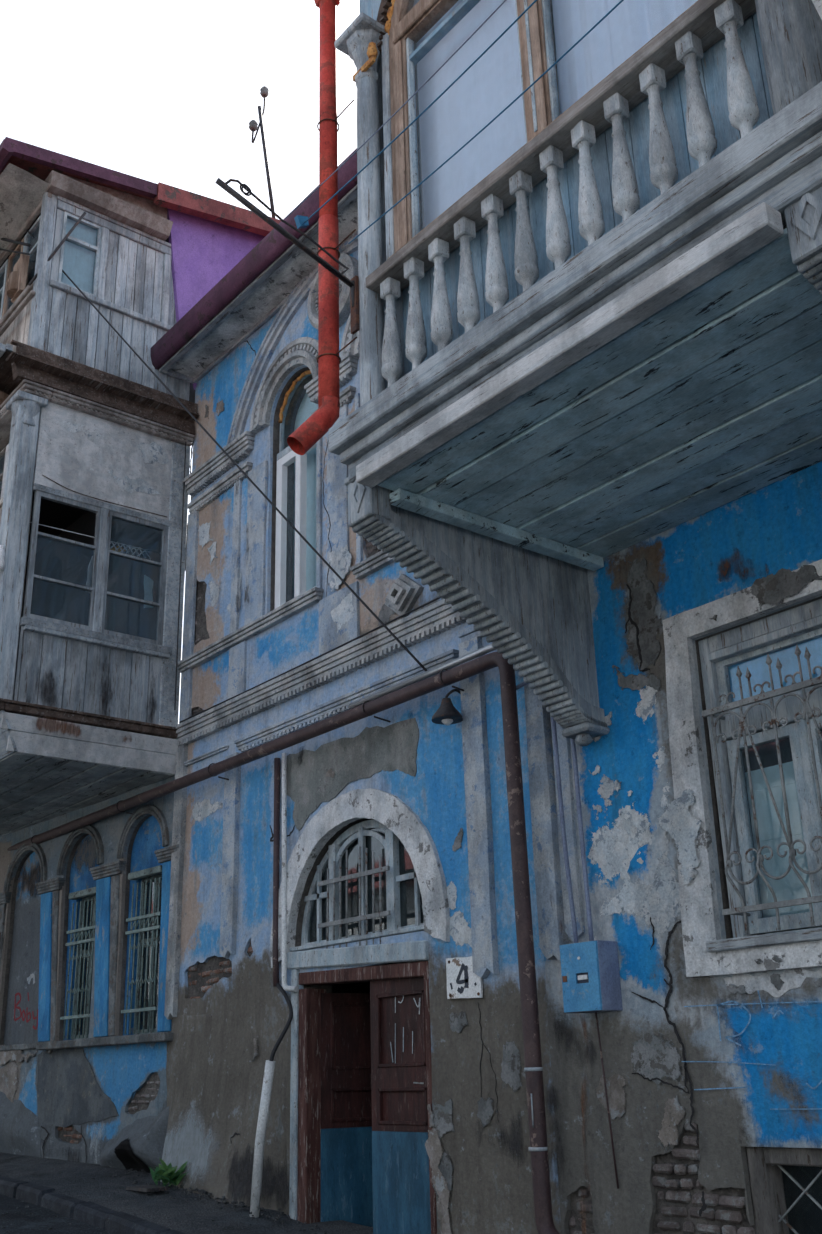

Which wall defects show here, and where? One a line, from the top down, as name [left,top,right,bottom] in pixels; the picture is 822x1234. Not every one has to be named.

peeling [185,523,218,571]
flaking render [194,573,243,645]
crack [625,584,650,672]
spalling [751,565,822,610]
spalling [287,718,419,831]
peeling [588,746,702,934]
flaking render [187,956,232,999]
crack [632,917,698,1145]
spalling [0,1044,160,1144]
spalling [425,1099,455,1234]
flaking render [595,1032,757,1234]